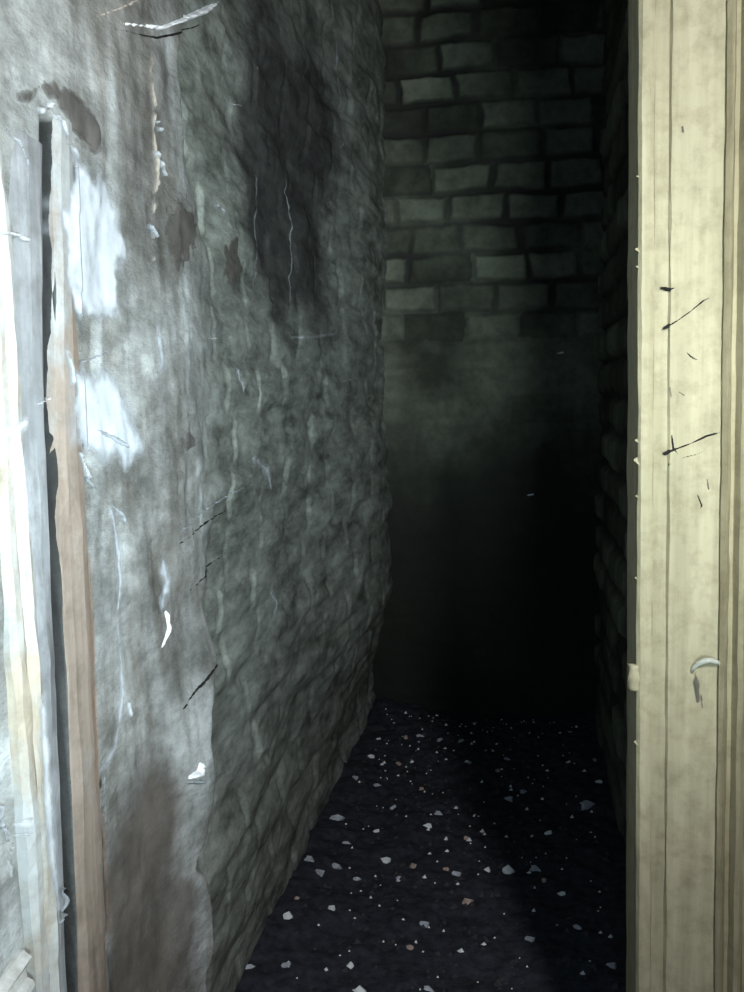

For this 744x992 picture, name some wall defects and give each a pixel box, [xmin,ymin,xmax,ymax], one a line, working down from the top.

peeling [19,82,126,316]
crack [180,483,254,544]
crack [183,653,226,709]